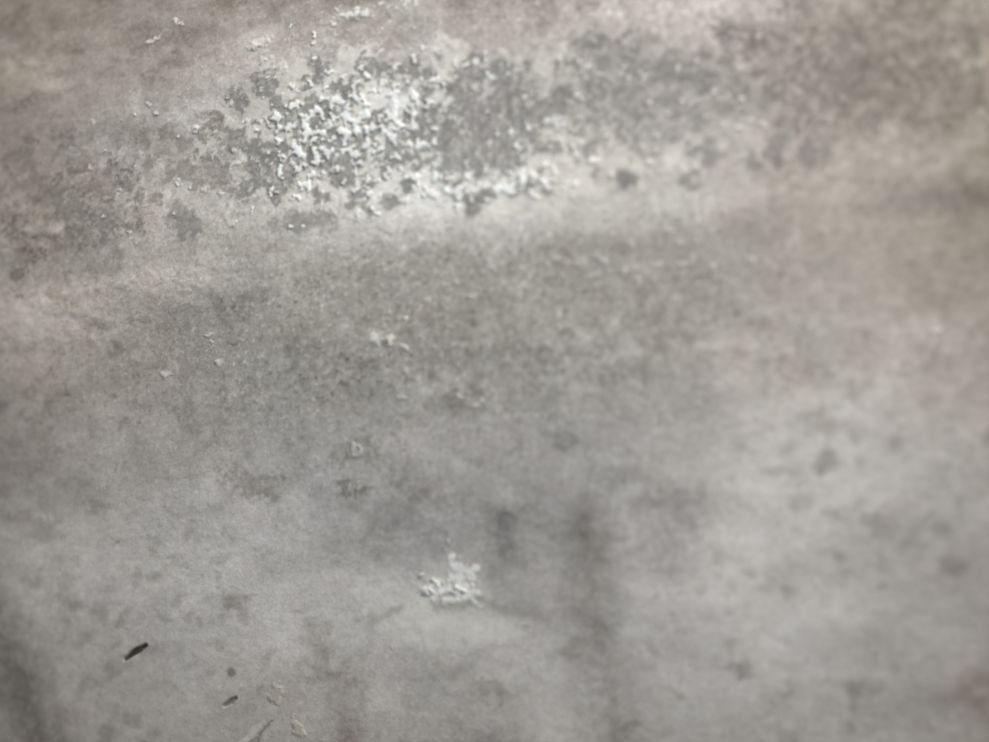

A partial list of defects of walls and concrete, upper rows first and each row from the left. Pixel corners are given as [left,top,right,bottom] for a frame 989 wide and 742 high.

peeling [88,0,841,262]
leakage [213,426,739,742]
crack [237,719,274,742]